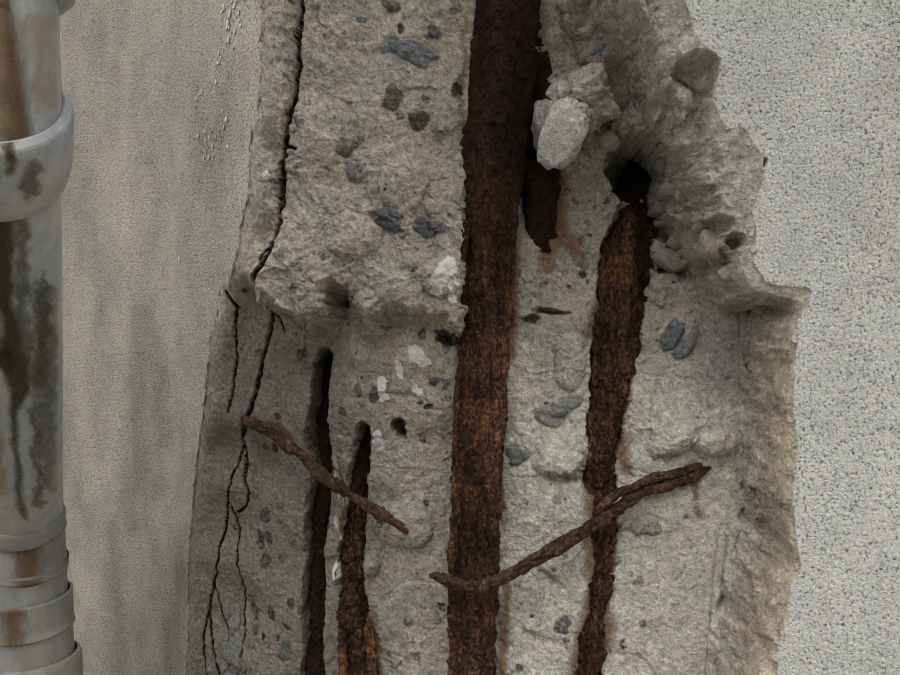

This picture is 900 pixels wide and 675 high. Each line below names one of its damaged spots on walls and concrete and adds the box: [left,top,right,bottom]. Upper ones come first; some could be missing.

crack [253,5,305,280]
crack [203,290,285,675]
rust [304,354,334,477]
spalling [184,0,476,675]
rust [304,425,381,675]
rust [446,0,583,675]
rust [570,517,618,675]
rust [583,160,660,520]
spalling [495,0,811,675]
rust [686,479,702,518]